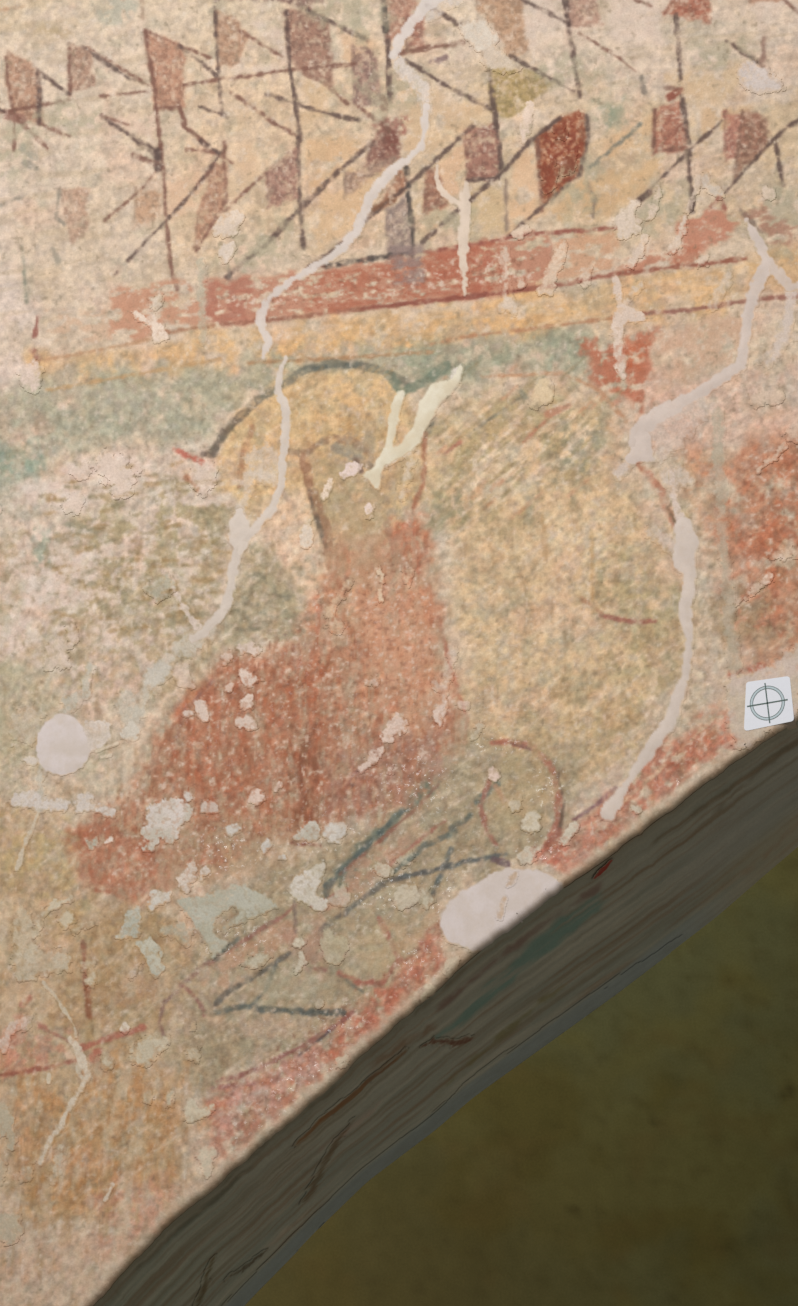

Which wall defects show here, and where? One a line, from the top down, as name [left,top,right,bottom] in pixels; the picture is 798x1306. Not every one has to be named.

crack [517,100,535,144]
crack [121,0,519,744]
crack [598,216,798,823]
peeling [430,644,486,741]
flaking render [139,787,243,853]
peeling [247,779,284,806]
peeling [357,711,409,776]
peeling [487,765,502,783]
flaking render [114,819,351,981]
flaking render [372,848,437,911]